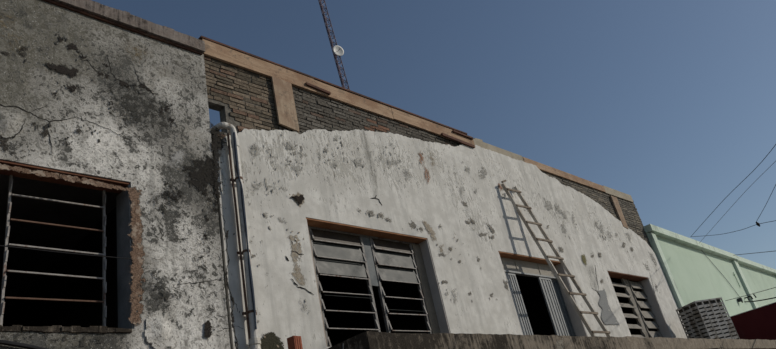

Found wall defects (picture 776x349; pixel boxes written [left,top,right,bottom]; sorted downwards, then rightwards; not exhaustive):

crack [0,104,143,154]
leakage [108,80,181,138]
leakage [146,122,227,232]
spalling [245,179,305,207]
peeling [250,133,307,176]
flaking render [0,163,146,326]
leakage [146,257,182,310]
peeling [263,213,314,313]
spalling [592,267,620,325]